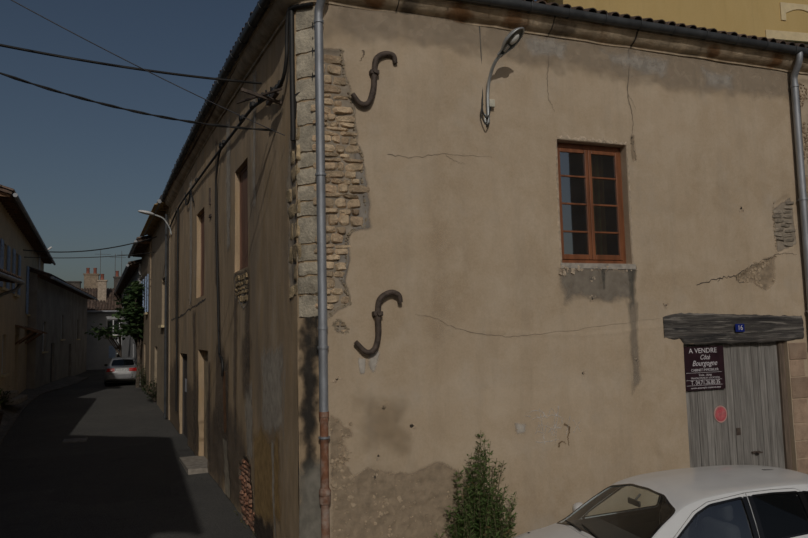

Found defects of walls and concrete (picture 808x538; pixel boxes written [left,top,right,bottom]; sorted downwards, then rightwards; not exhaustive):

crack [627,30,639,159]
flaking render [286,125,301,300]
flaking render [310,49,370,335]
flaking render [734,198,796,290]
leakage [300,316,319,471]
flaking render [239,454,255,533]
flaking render [330,463,467,538]